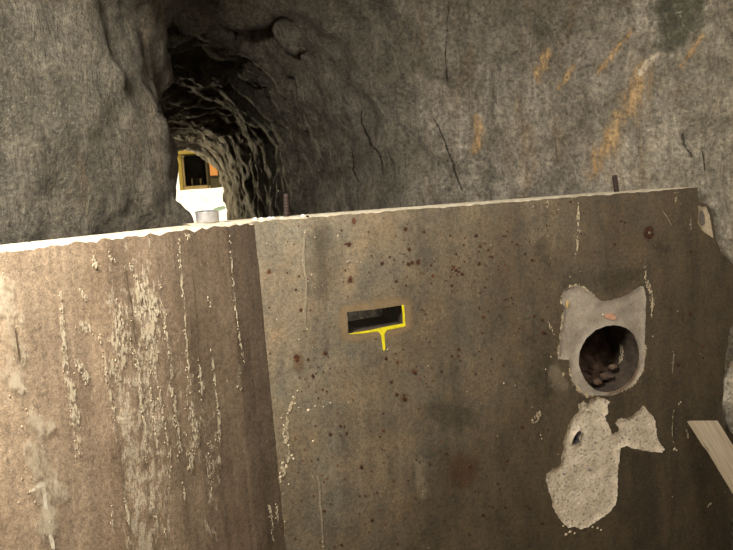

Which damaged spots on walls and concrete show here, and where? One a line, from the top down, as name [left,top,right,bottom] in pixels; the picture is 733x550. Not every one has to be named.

crack [360,111,383,170]
crack [433,118,462,190]
damp [59,291,82,458]
damp [98,230,221,491]
spalling [546,283,676,536]